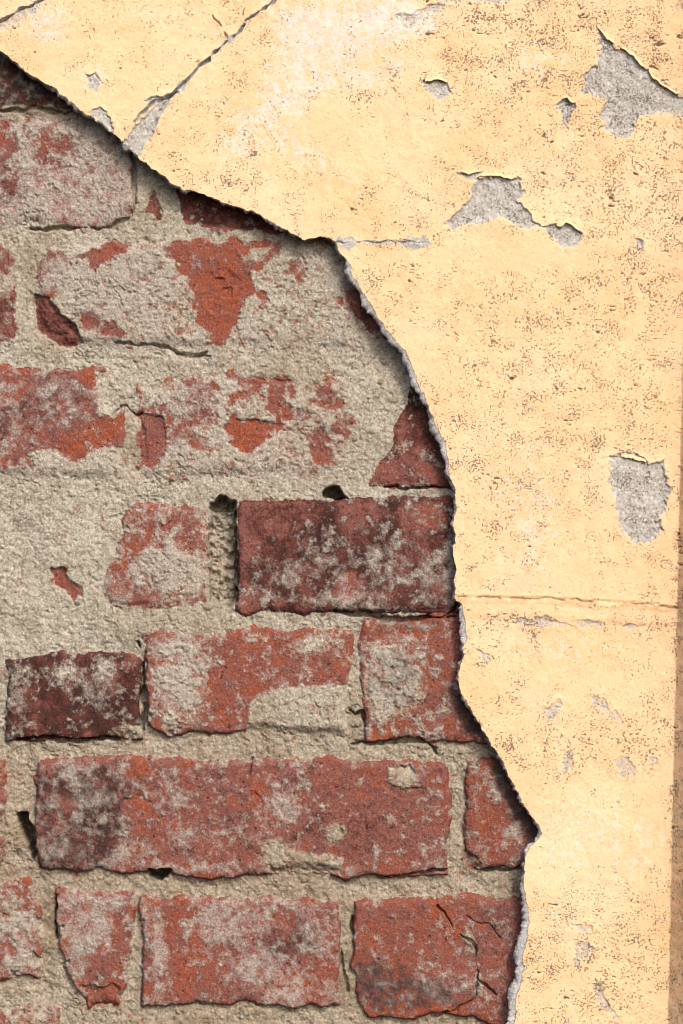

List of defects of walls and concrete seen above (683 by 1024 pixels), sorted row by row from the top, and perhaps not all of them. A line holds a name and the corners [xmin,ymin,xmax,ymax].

crack [133,0,276,128]
peeling [556,26,683,138]
peeling [446,168,583,248]
flaking render [0,51,542,1024]
peeling [607,450,673,544]
crack [430,904,501,1018]